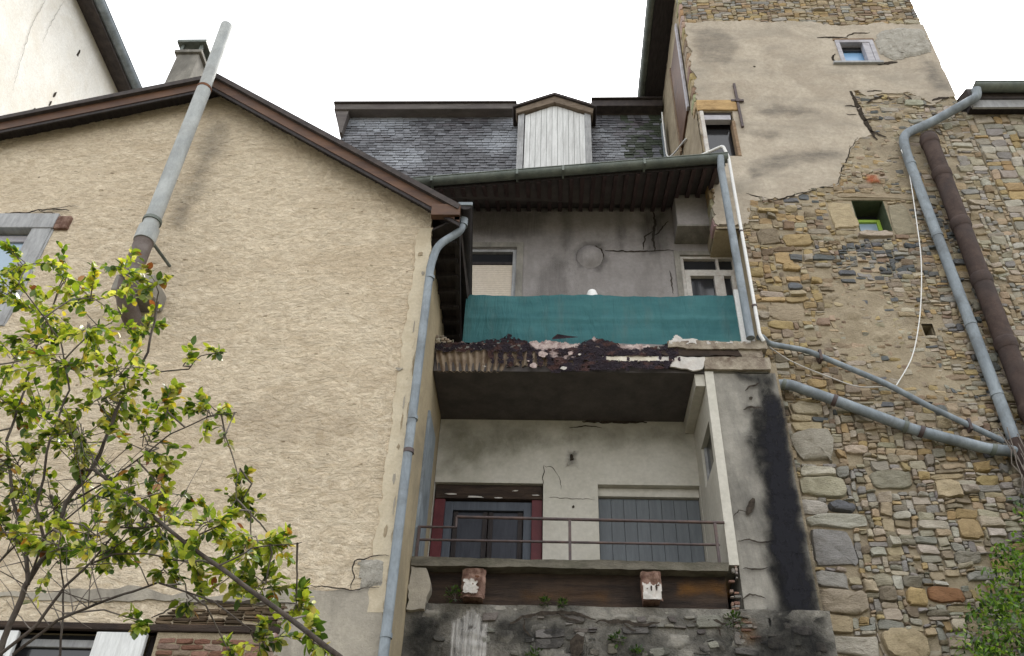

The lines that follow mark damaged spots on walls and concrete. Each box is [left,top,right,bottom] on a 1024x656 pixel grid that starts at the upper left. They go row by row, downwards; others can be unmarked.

crack [846,90,949,140]
crack [605,212,674,293]
spalling [435,334,705,373]
water stain [738,373,831,656]
spalling [547,633,584,656]
spalling [640,566,765,656]